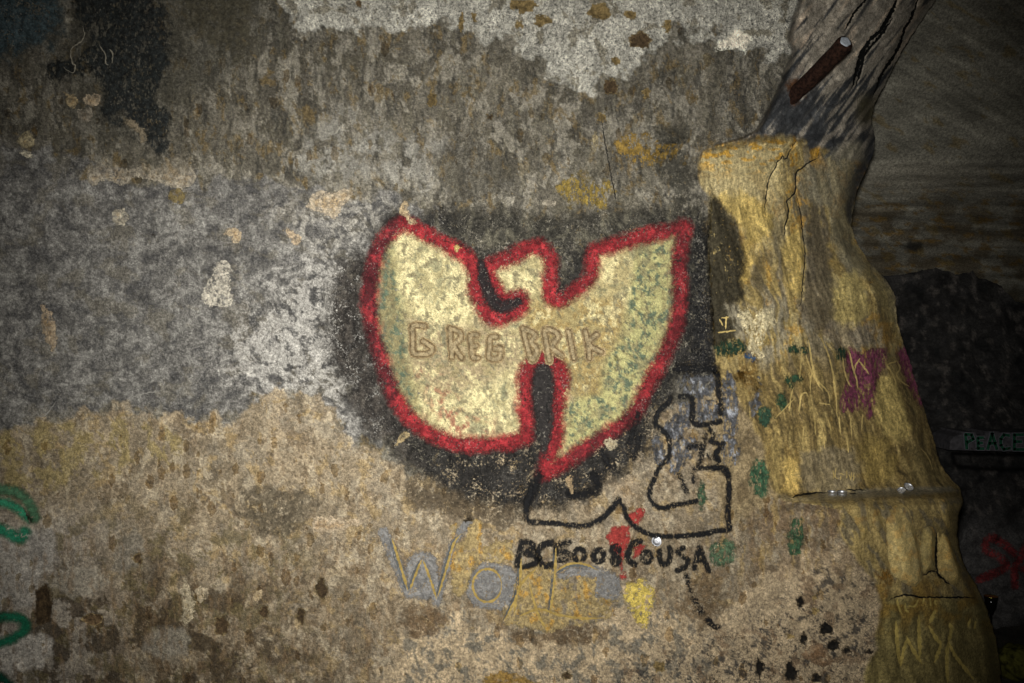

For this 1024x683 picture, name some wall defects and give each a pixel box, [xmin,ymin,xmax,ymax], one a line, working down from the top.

crack [844,0,918,97]
crack [764,141,818,311]
crack [792,489,867,498]
crack [890,533,976,600]